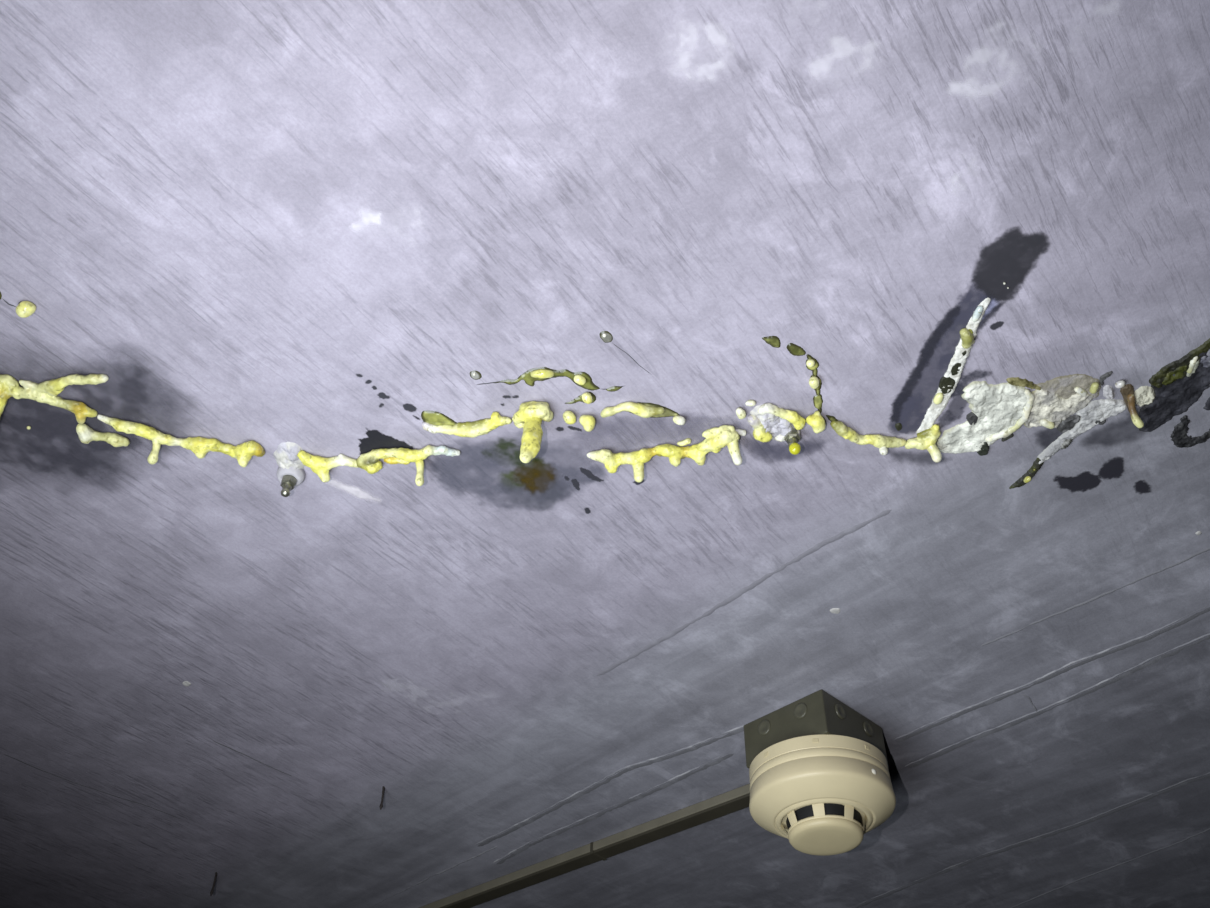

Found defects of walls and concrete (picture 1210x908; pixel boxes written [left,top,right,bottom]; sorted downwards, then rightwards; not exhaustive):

leakage [890,228,1141,492]
leakage [0,367,175,482]
leakage [433,447,510,496]
corrosion [497,439,554,493]
leakage [1134,481,1150,494]